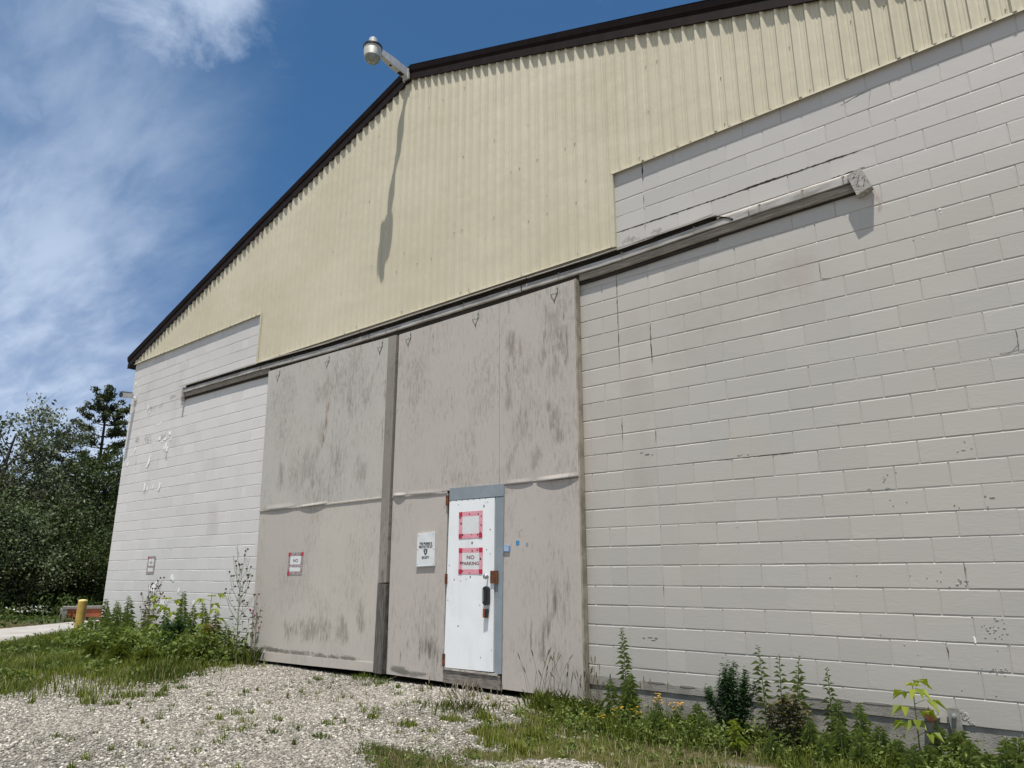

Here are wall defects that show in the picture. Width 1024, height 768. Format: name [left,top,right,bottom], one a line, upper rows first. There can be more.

crack [620,151,864,232]